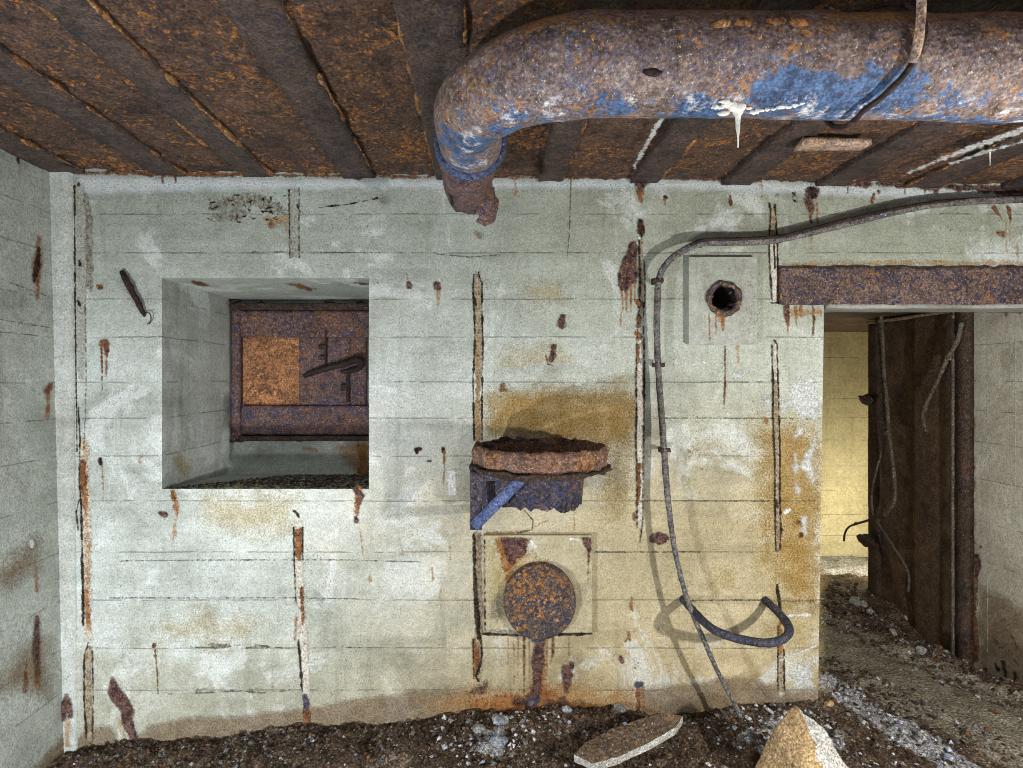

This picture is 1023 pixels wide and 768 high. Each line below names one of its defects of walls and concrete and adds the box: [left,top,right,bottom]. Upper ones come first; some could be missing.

rust [87,0,362,180]
rust [2,129,244,186]
spalling [207,193,286,223]
rust [32,237,42,301]
rust [618,219,645,324]
rust [99,339,110,389]
rust [353,486,364,523]
water stain [763,377,820,617]
rust [23,616,41,693]
rust [108,677,138,741]
rust [513,637,555,709]
rust [559,652,574,706]